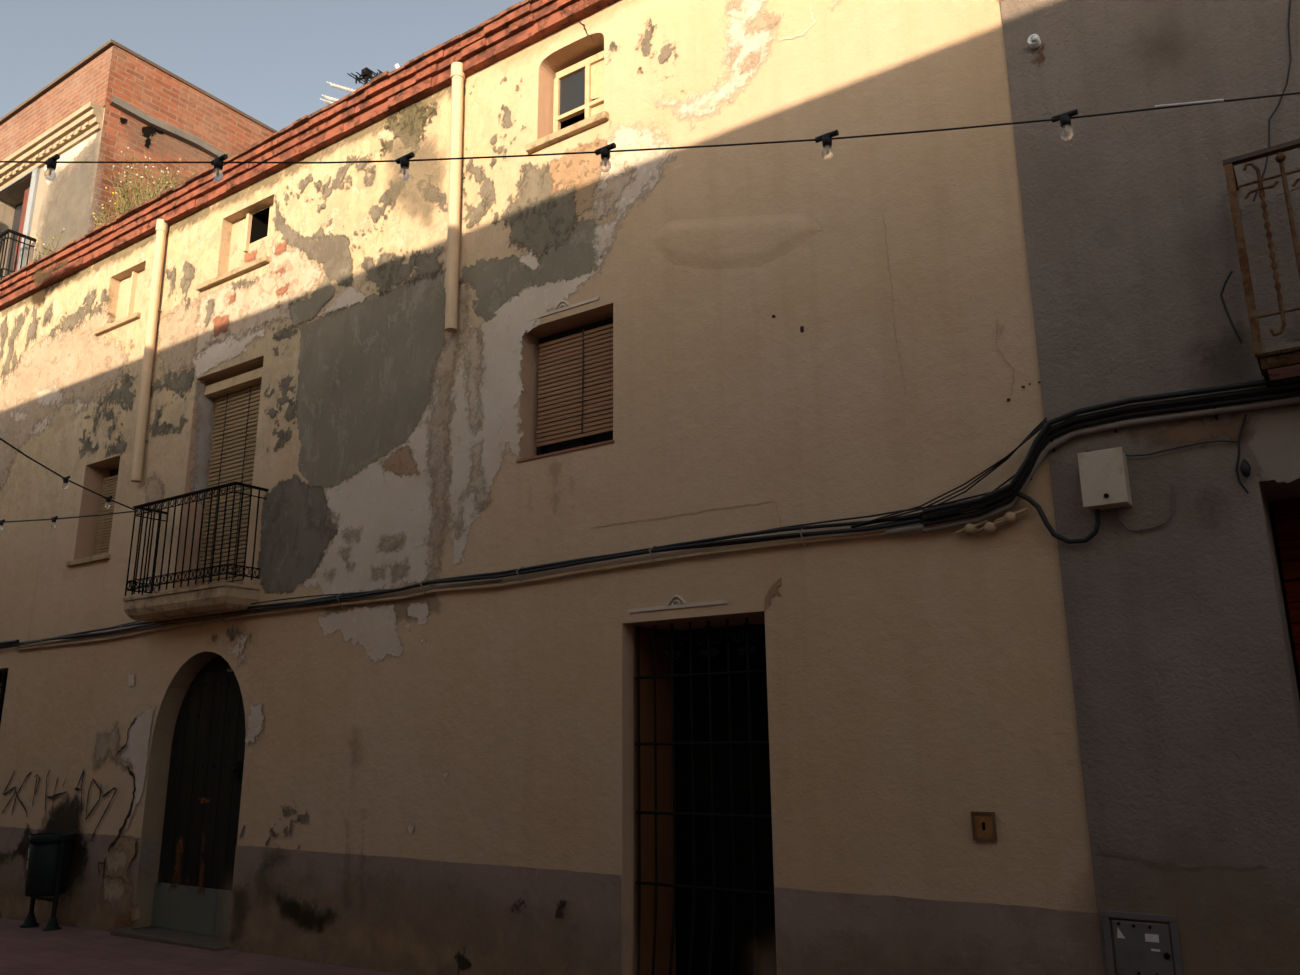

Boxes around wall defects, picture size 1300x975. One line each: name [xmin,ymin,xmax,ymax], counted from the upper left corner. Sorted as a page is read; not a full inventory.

peeling [635,19,678,78]
peeling [655,0,816,128]
peeling [0,309,135,490]
spalling [156,154,393,507]
peeling [300,104,677,663]
peeling [92,706,155,830]
peeling [245,702,264,744]
damp [230,853,604,975]